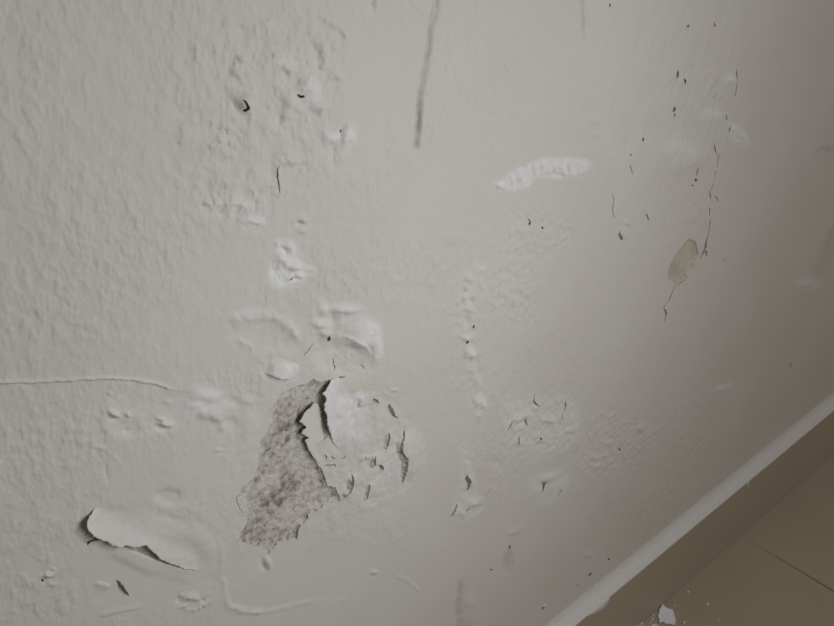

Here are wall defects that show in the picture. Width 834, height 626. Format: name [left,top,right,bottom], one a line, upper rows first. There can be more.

peeling [667,239,699,285]
peeling [236,296,428,574]
peeling [87,505,200,571]